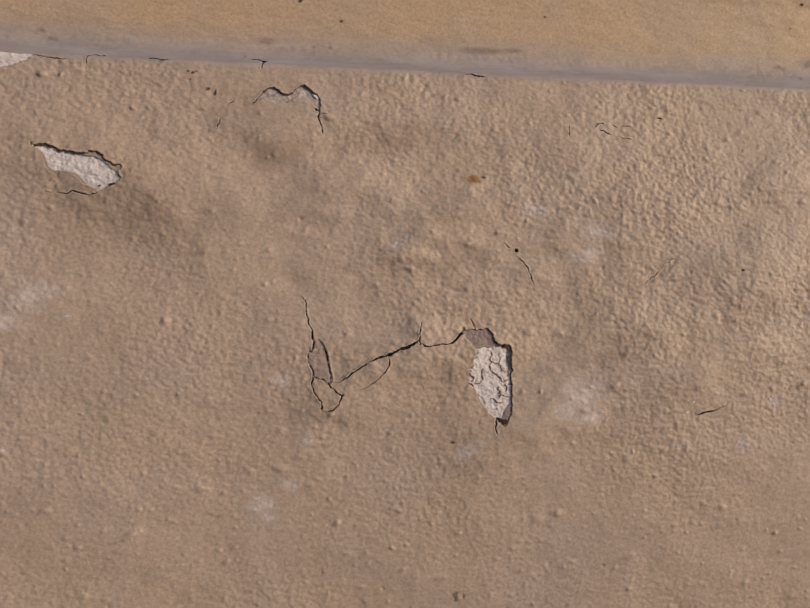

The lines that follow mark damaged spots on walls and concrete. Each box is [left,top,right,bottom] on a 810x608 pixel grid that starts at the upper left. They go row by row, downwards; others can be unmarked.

peeling [0,49,34,69]
peeling [249,82,327,135]
peeling [30,140,124,198]
crack [504,242,535,284]
crack [333,321,465,393]
peeling [462,318,515,437]